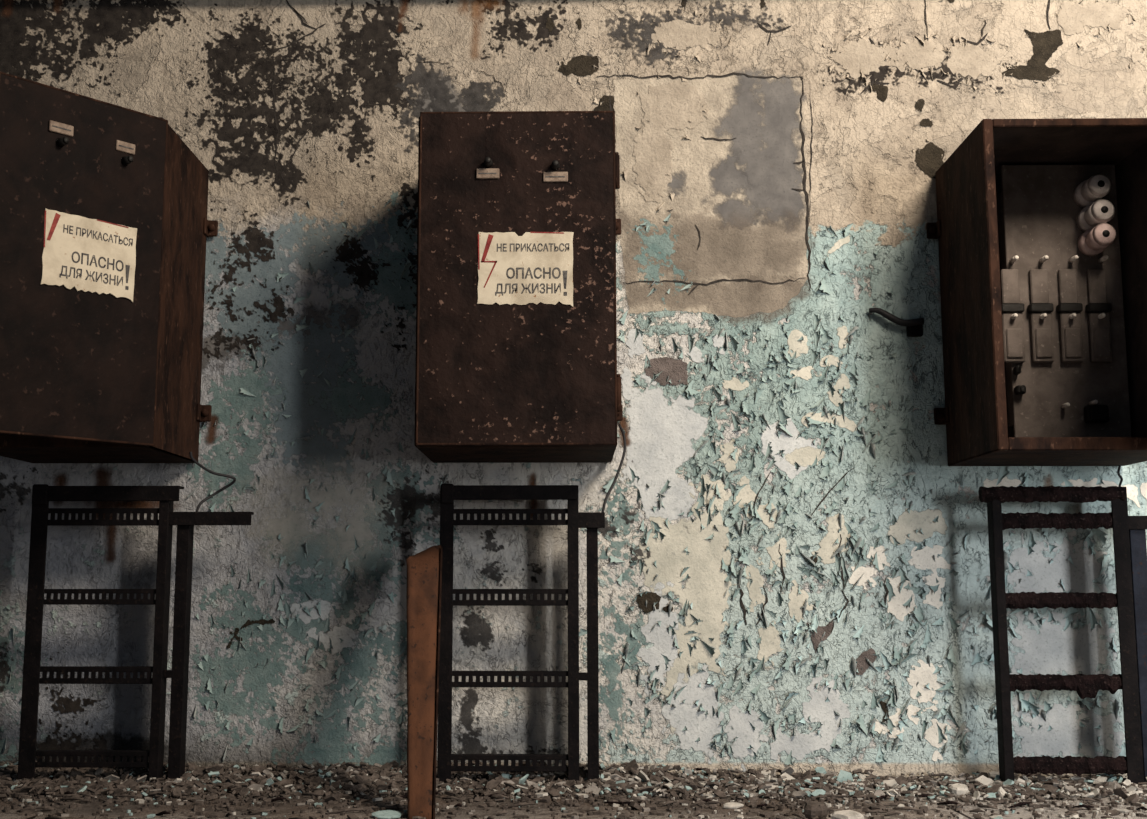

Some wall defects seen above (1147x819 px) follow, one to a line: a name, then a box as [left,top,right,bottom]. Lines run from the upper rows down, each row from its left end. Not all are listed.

peeling [641,0,731,63]
flaking render [557,55,601,84]
peeling [823,28,1063,102]
flaking render [594,95,615,111]
flaking render [912,99,945,179]
peeling [983,466,1028,488]
peeling [1061,474,1147,508]
corrosion [95,501,159,562]
peeling [579,310,994,772]
peeling [1003,528,1115,593]
peeling [1007,607,1118,676]
peeling [1010,689,1126,758]